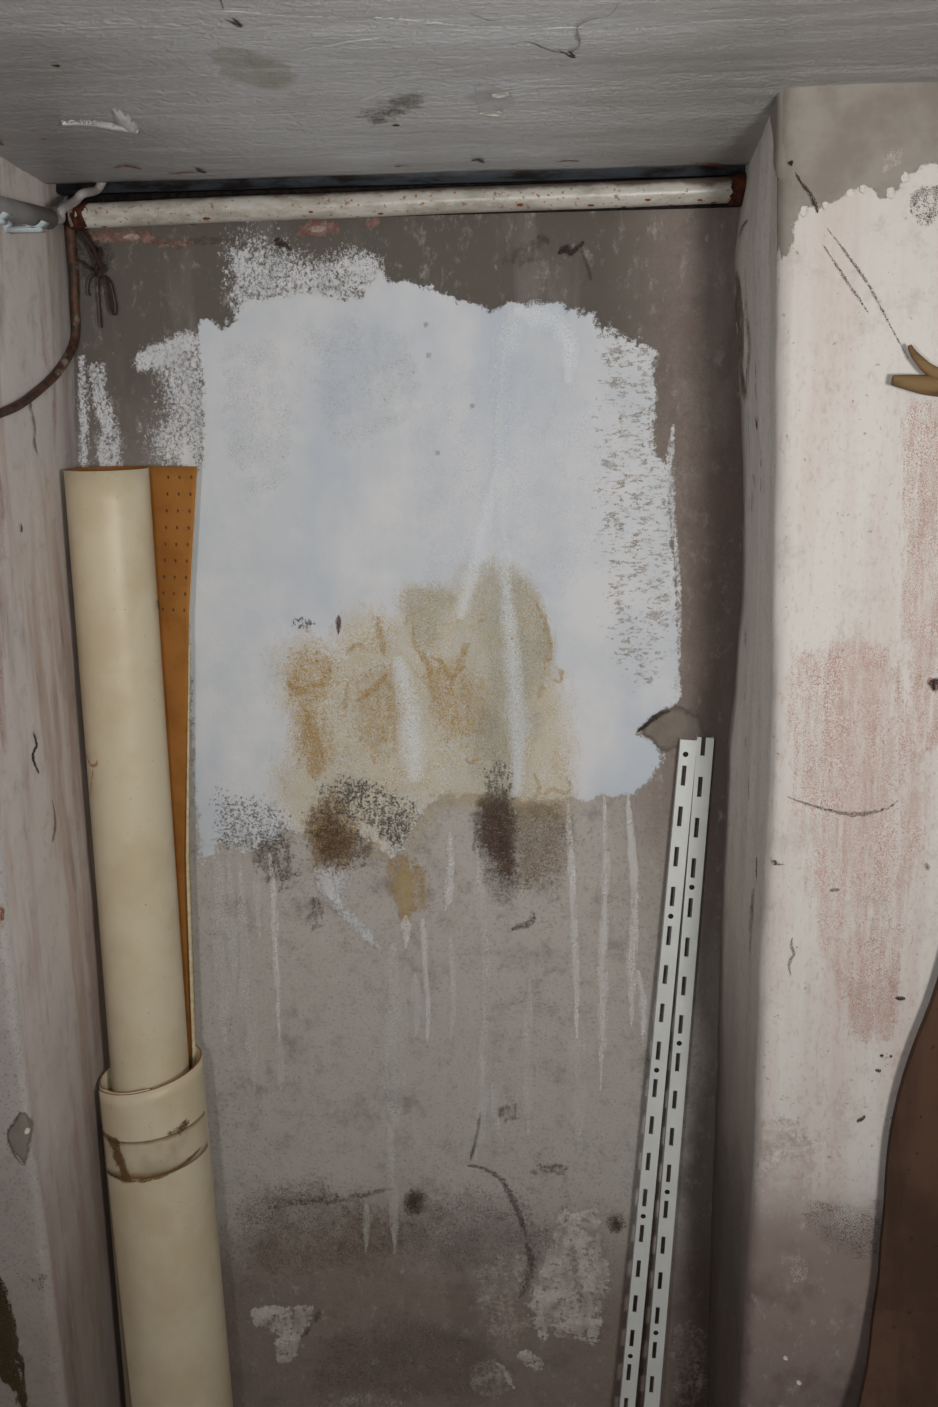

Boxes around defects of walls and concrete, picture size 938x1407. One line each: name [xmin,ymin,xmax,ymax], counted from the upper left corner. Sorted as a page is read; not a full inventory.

peeling [769,82,938,259]
water stain [210,555,587,1049]
spalling [637,706,707,752]
water stain [218,1126,563,1297]